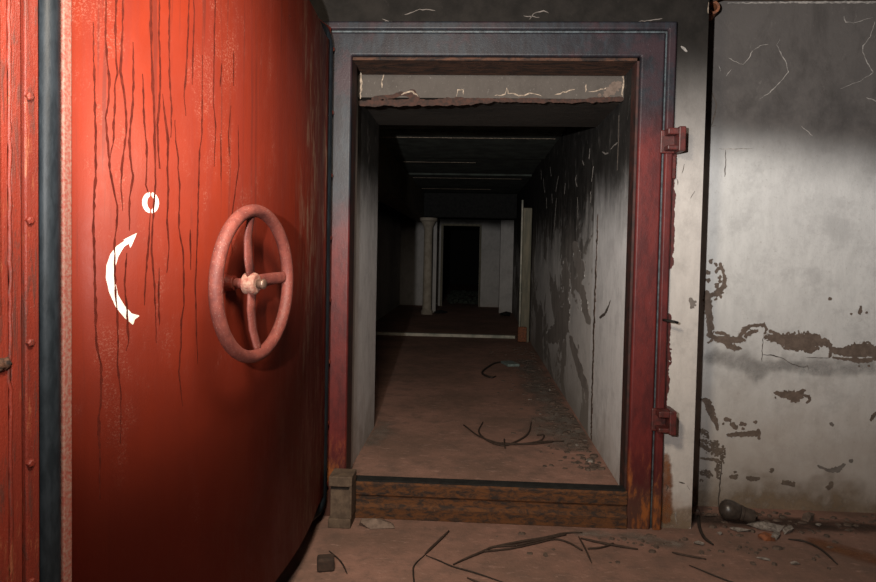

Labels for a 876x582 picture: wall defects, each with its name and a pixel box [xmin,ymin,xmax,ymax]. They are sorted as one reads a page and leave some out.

peeling [688,259,876,367]
flaking render [699,397,761,482]
corrosion [661,455,673,524]
damp [661,488,876,531]
peeling [817,459,853,490]